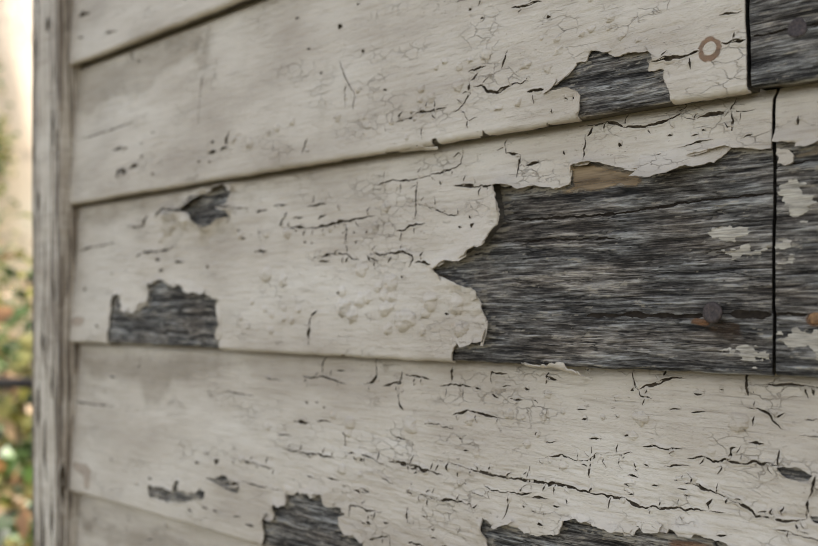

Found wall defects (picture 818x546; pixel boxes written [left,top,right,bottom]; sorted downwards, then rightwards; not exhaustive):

crack [511,0,542,14]
peeling [541,37,687,123]
crack [649,49,700,70]
rust [698,37,722,62]
crack [718,9,746,47]
peeling [749,0,818,88]
crack [581,98,756,160]
peeling [428,115,818,380]
peeling [95,256,228,351]
peeling [232,453,374,546]
crack [229,370,818,546]
peeling [473,493,777,546]